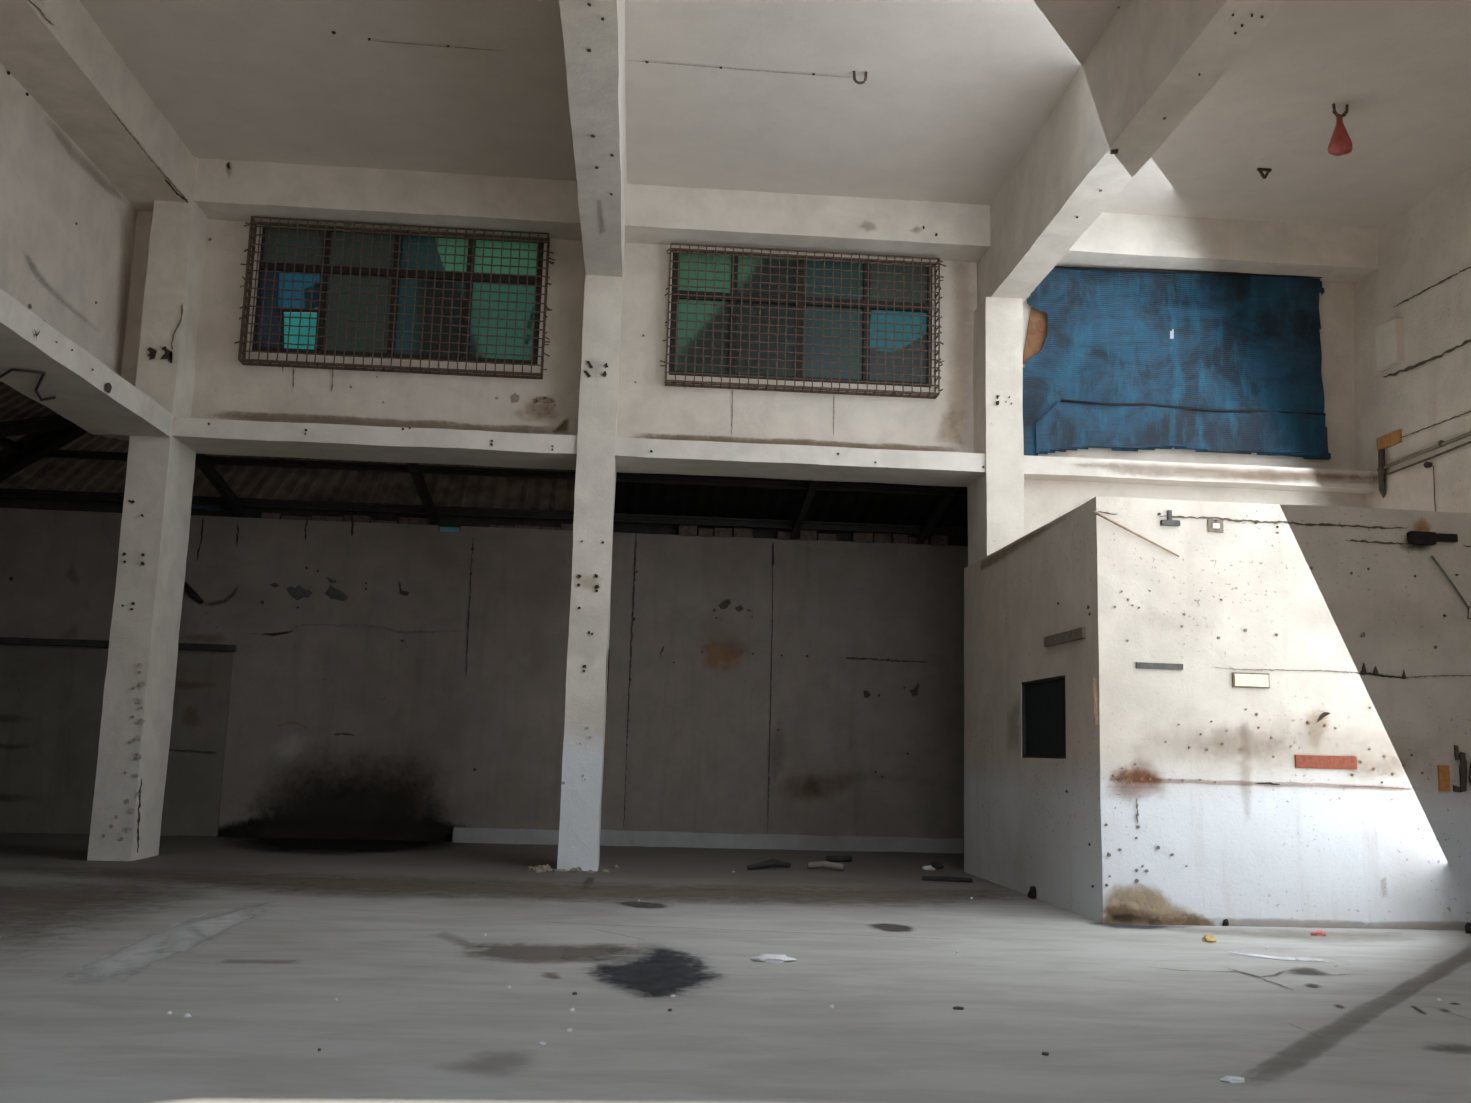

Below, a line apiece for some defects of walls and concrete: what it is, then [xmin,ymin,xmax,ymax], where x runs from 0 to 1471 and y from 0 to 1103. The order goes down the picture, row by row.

corrosion [1111,763,1216,783]